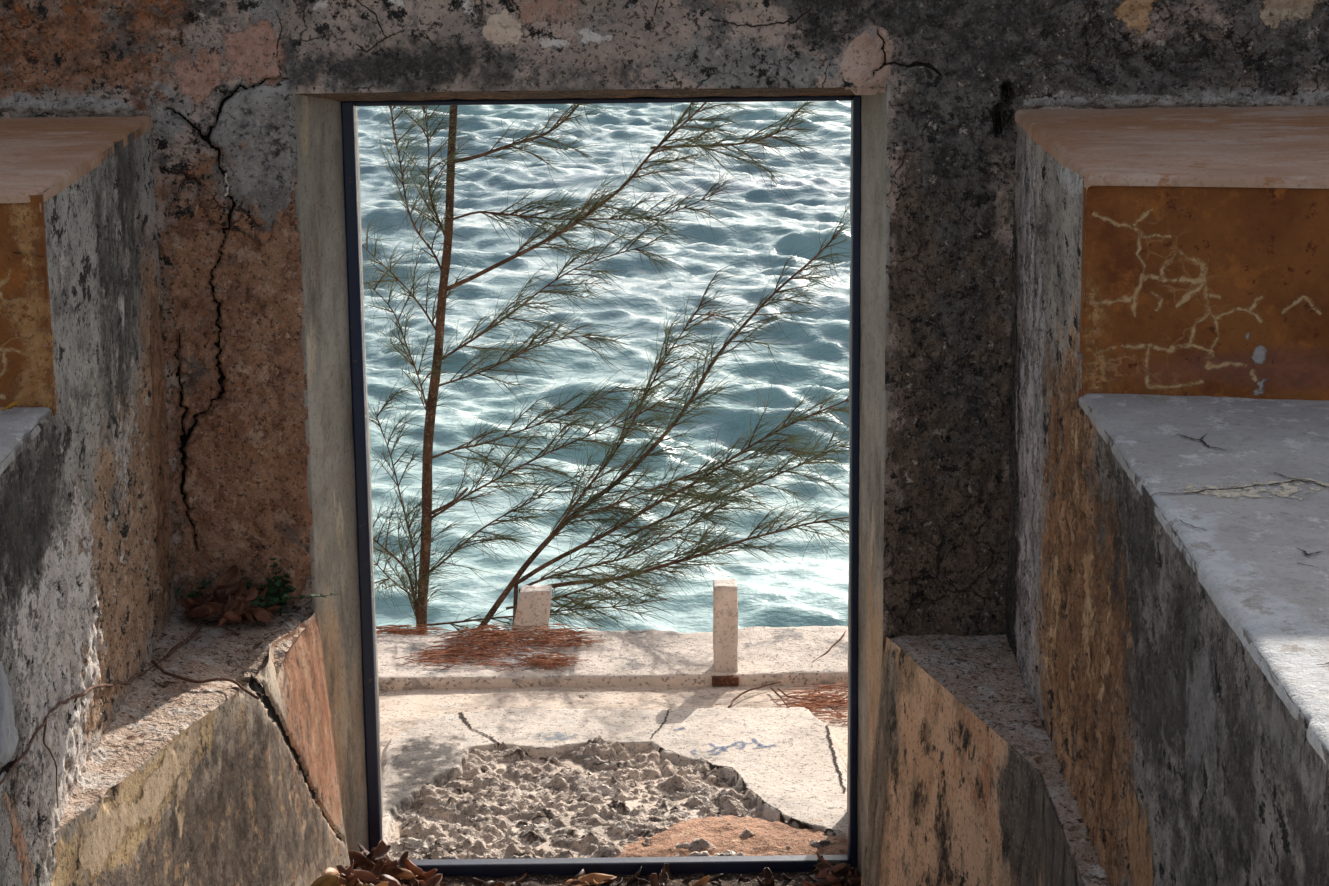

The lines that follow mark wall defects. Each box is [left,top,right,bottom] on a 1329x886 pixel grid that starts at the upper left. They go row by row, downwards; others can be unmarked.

crack [873,29,942,77]
crack [0,252,44,303]
crack [159,10,288,549]
crack [1089,209,1322,389]
crack [0,348,28,399]
crack [1177,433,1225,450]
crack [1150,472,1329,530]
crack [249,673,341,840]
crack [459,712,499,748]
crack [650,709,840,834]
crack [825,725,846,792]